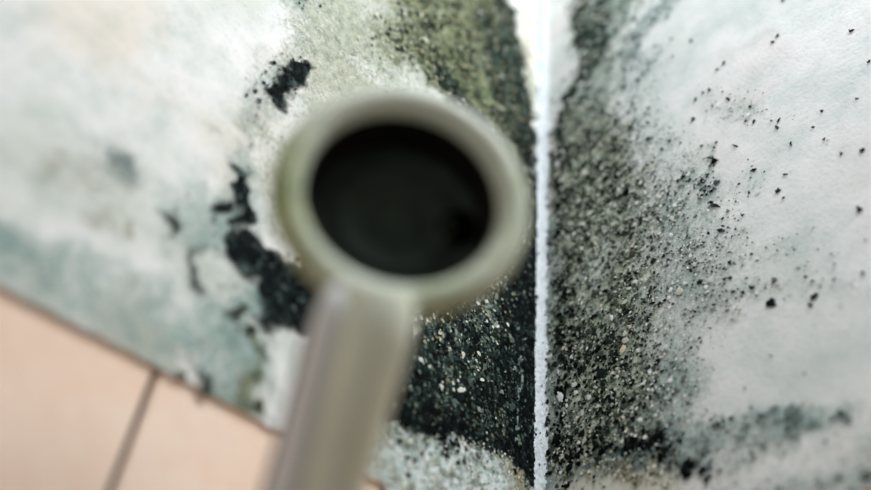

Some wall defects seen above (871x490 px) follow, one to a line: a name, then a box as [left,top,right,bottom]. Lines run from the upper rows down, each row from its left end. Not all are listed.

leakage [143,163,323,415]
leakage [245,0,871,490]